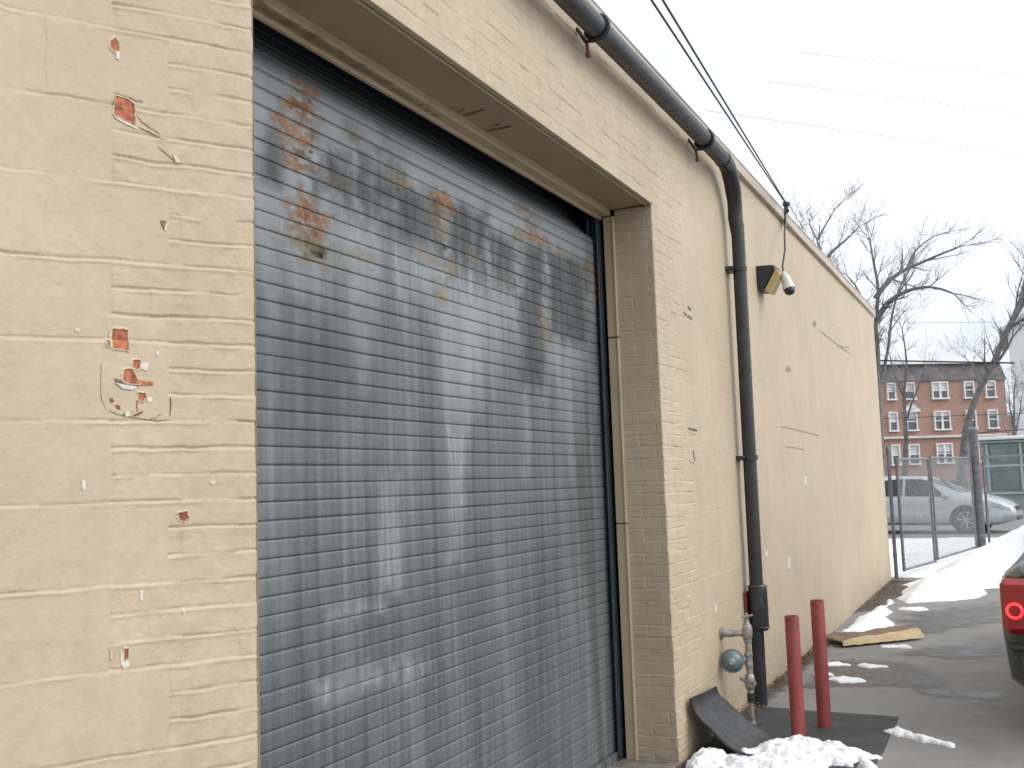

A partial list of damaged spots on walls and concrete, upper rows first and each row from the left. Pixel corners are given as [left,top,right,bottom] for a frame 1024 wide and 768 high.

peeling [108,35,120,60]
spalling [111,92,180,164]
corrosion [273,76,317,173]
damp [328,156,388,219]
corrosion [286,190,330,265]
damp [395,191,587,393]
peeling [101,326,171,422]
peeling [175,509,190,524]